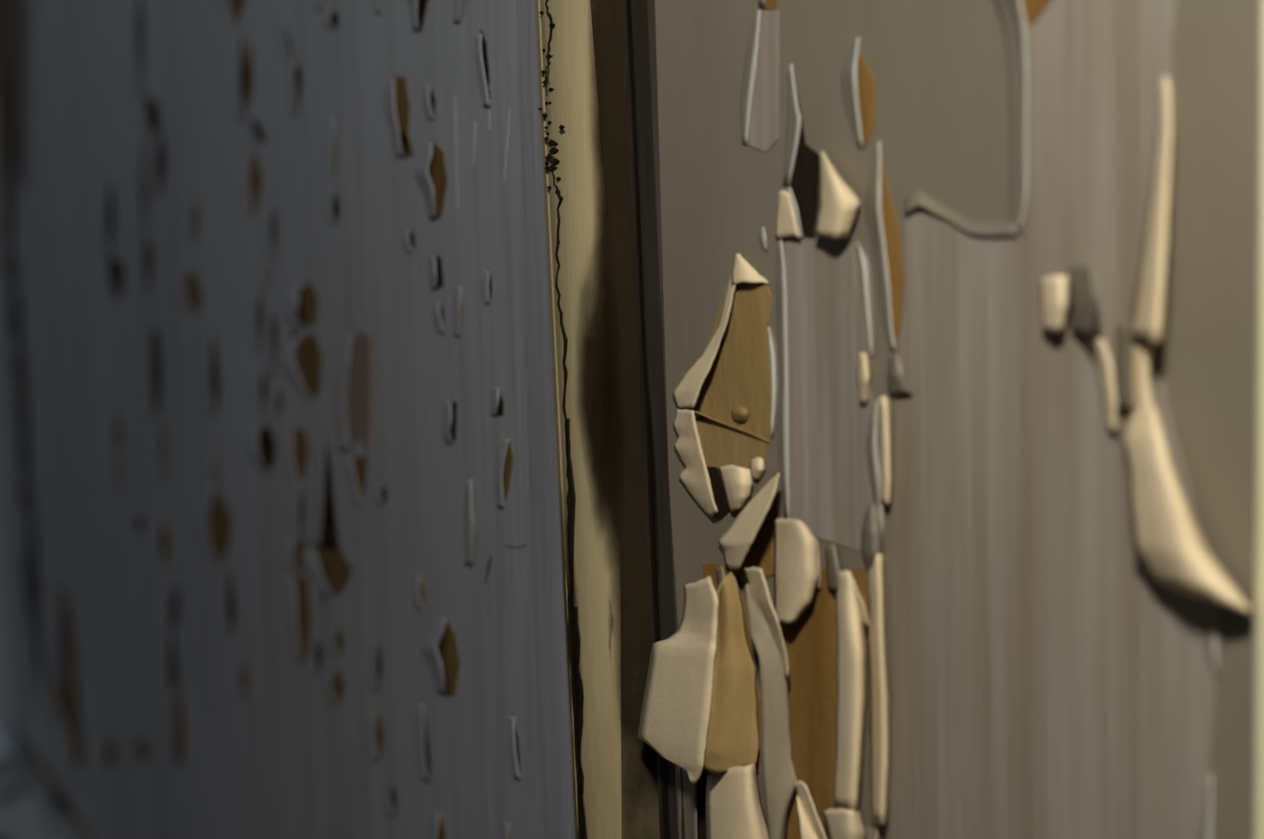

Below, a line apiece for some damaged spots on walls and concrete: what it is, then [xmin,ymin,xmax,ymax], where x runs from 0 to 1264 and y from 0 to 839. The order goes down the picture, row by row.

peeling [217,0,267,216]
peeling [385,76,447,221]
peeling [408,0,428,32]
peeling [474,30,490,108]
crack [545,0,553,96]
peeling [428,253,444,289]
peeling [195,456,232,564]
peeling [248,281,372,664]
peeling [495,437,514,510]
crack [552,165,584,795]
peeling [638,0,1252,839]
peeling [423,616,460,695]